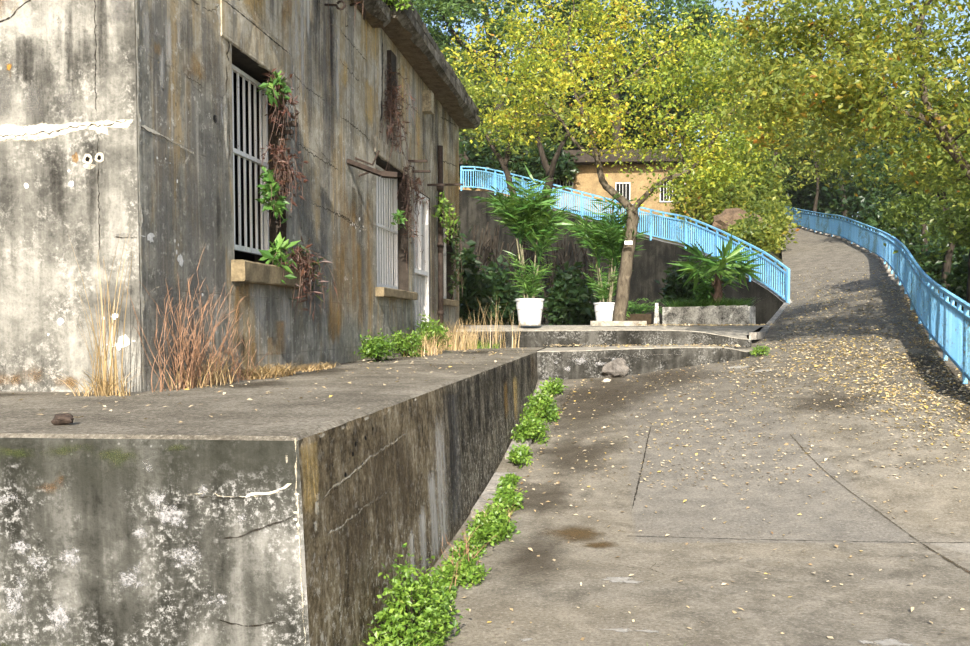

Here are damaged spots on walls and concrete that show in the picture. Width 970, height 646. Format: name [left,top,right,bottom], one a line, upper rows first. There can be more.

damp [66,39,86,72]
crack [192,0,322,98]
damp [293,0,339,149]
crack [0,0,193,249]
damp [560,372,692,422]
damp [399,357,530,557]
damp [552,446,603,465]
crack [197,483,292,499]
crack [323,434,405,533]
crack [223,517,291,539]
damp [552,528,613,548]
crack [220,619,275,627]